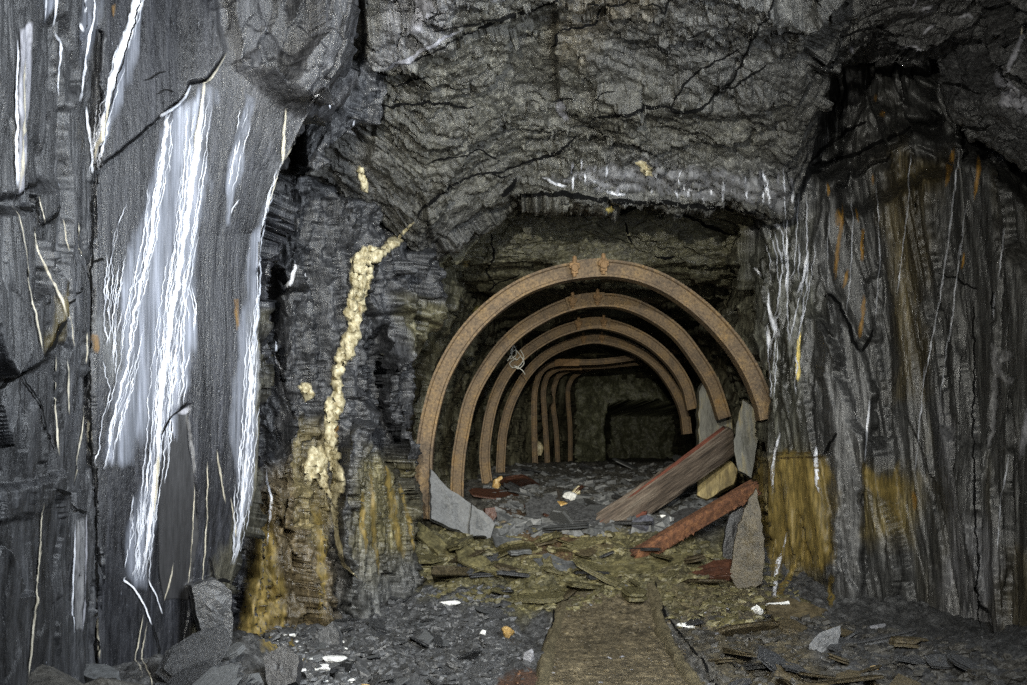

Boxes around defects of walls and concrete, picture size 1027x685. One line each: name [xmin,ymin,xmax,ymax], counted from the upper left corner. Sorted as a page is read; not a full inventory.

crack [107,0,141,118]
damp [227,112,250,212]
damp [281,112,291,161]
crack [381,0,892,244]
damp [279,264,297,289]
crack [0,55,225,664]
damp [95,54,226,622]
damp [232,175,294,651]
damp [312,510,328,610]
damp [359,466,415,570]
damp [756,437,835,605]
damp [864,403,901,521]